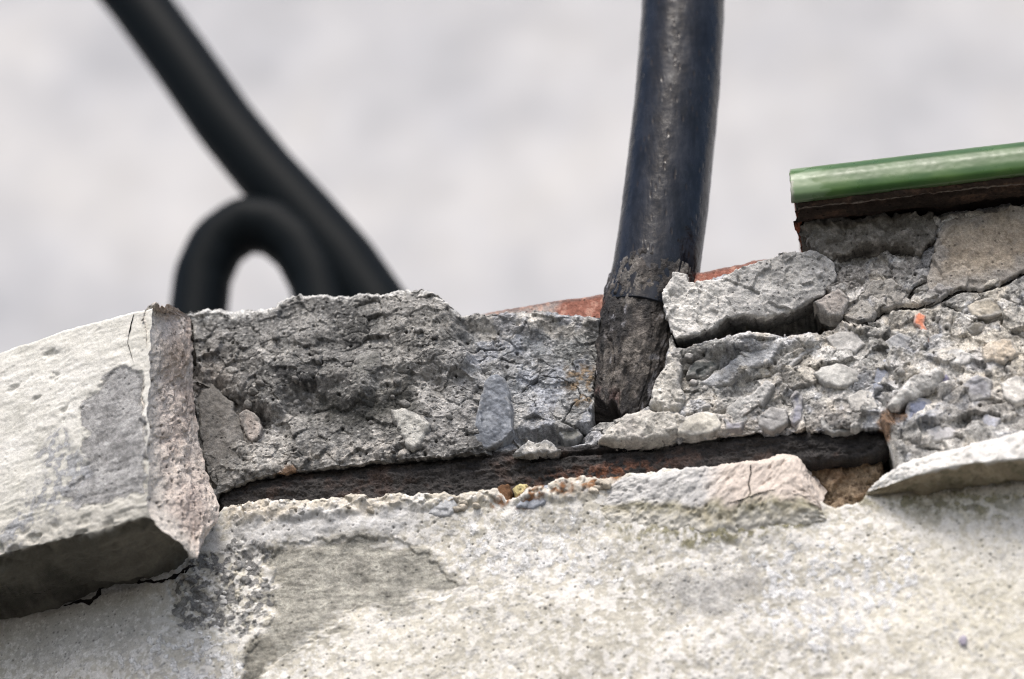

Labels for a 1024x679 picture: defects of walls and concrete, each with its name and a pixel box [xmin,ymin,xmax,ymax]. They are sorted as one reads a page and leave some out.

crack [840,274,1024,328]
spalling [186,203,1024,501]
rust [218,409,907,512]
crack [64,587,104,606]
crack [137,565,196,584]